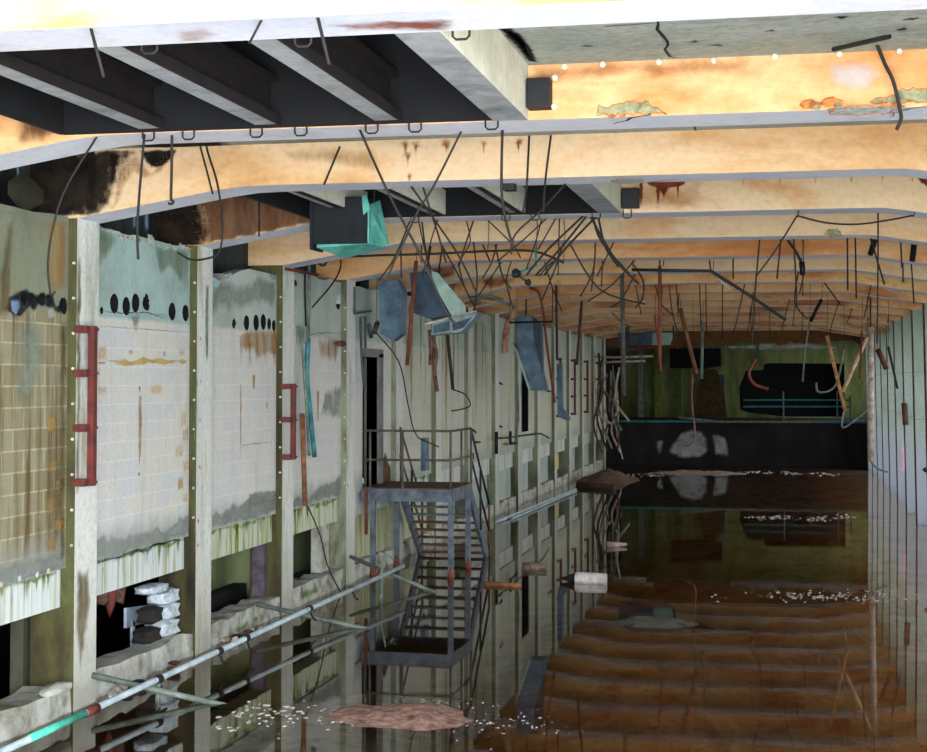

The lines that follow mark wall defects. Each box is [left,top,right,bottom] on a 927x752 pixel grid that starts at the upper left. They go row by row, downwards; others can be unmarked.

crack [606,21,675,58]
spalling [595,99,667,118]
spalling [827,87,927,116]
spalling [0,165,30,208]
corrosion [639,181,685,202]
leakage [30,142,227,287]
spalling [99,212,192,251]
spalling [213,243,251,288]
corrosion [244,333,259,354]
leakage [213,492,276,538]
leakage [97,517,188,568]
leakage [78,575,89,648]